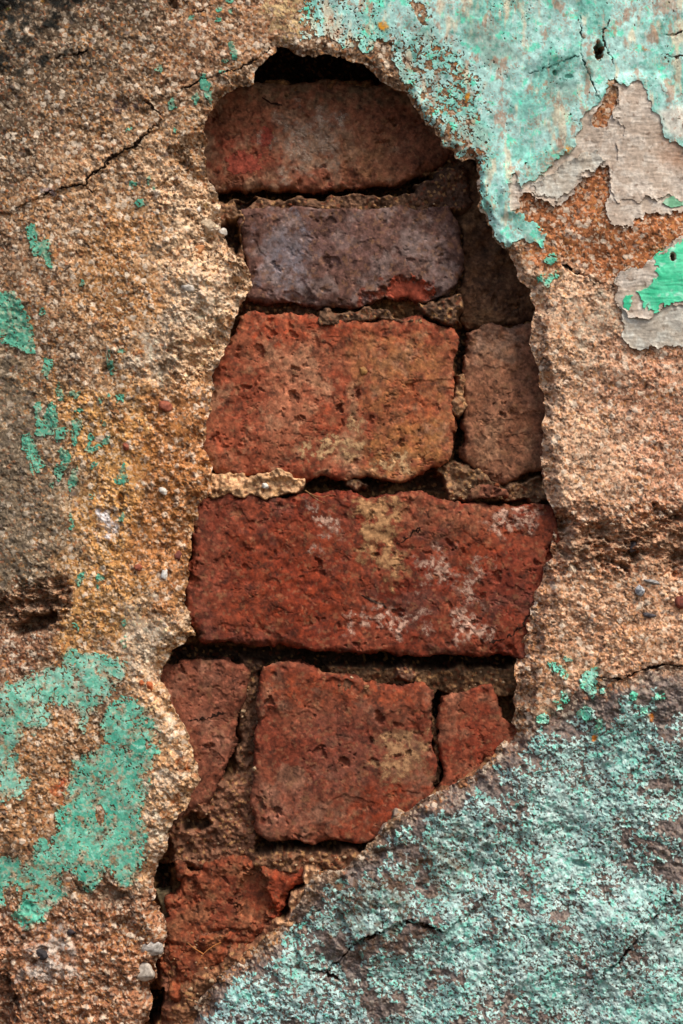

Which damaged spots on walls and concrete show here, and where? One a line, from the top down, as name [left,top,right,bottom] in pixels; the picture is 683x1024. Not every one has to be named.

peeling [191,73,213,105]
crack [177,47,270,93]
peeling [219,41,238,73]
crack [43,100,163,196]
peeling [298,0,683,288]
peeling [129,176,156,208]
spalling [385,273,436,301]
peeling [614,236,683,351]
spalling [162,324,216,377]
peeling [200,656,683,1024]